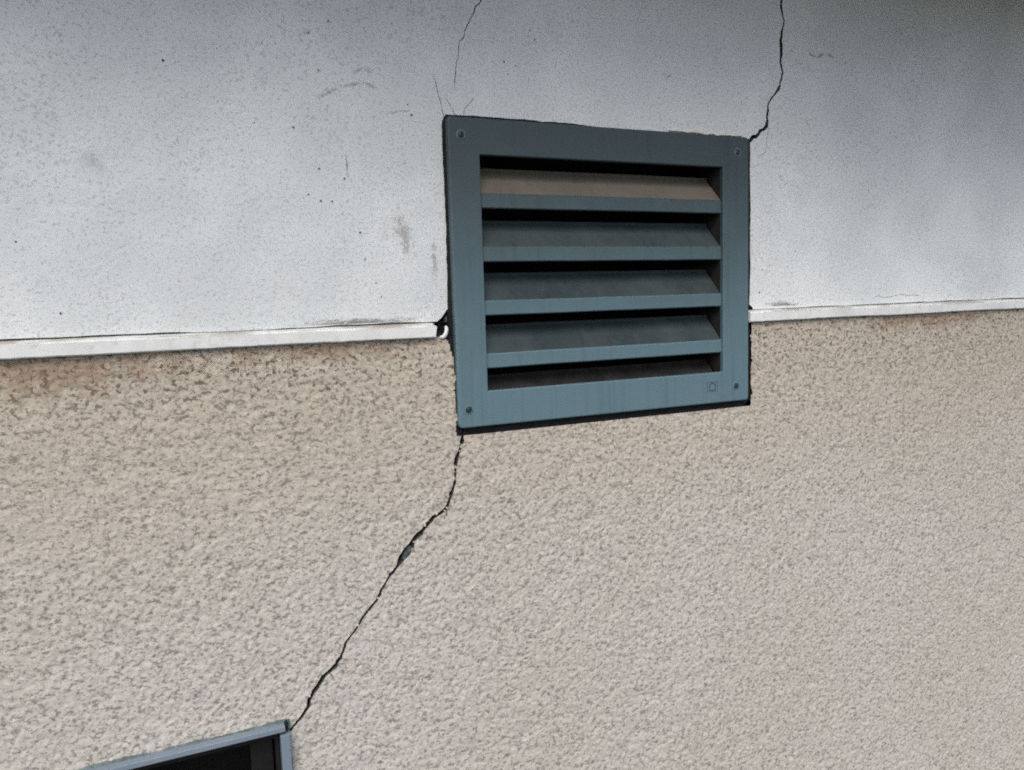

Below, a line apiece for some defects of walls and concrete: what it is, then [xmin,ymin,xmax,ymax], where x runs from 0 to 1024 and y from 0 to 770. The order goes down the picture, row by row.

crack [748,0,785,155]
crack [290,428,465,731]